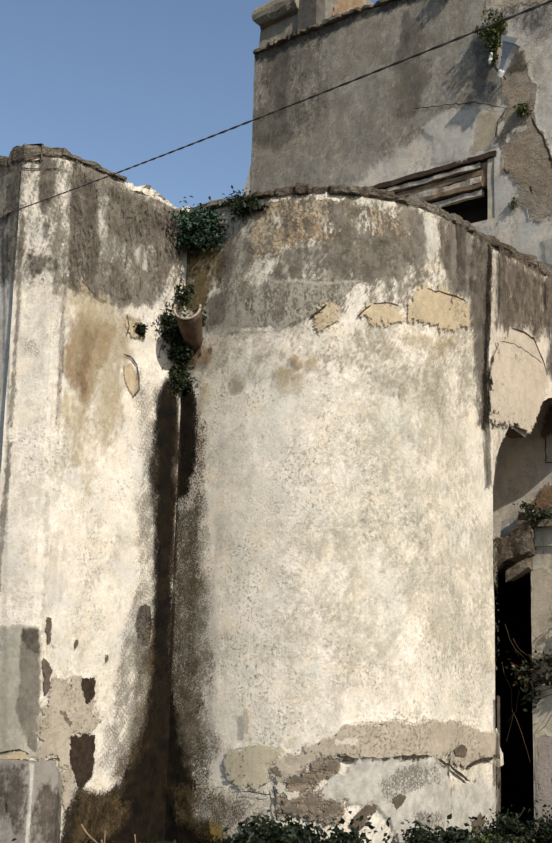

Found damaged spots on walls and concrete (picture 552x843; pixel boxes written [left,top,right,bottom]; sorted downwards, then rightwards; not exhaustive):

flaking render [485,0,552,13]
flaking render [494,61,552,224]
leakage [0,156,188,427]
flaking render [119,360,141,401]
flaking render [121,312,146,343]
flaking render [310,298,341,334]
leakage [203,0,552,488]
flaking render [359,280,471,335]
flaking render [489,328,549,434]
leakage [0,367,279,843]
flaking render [0,614,102,824]
peeling [222,711,504,835]